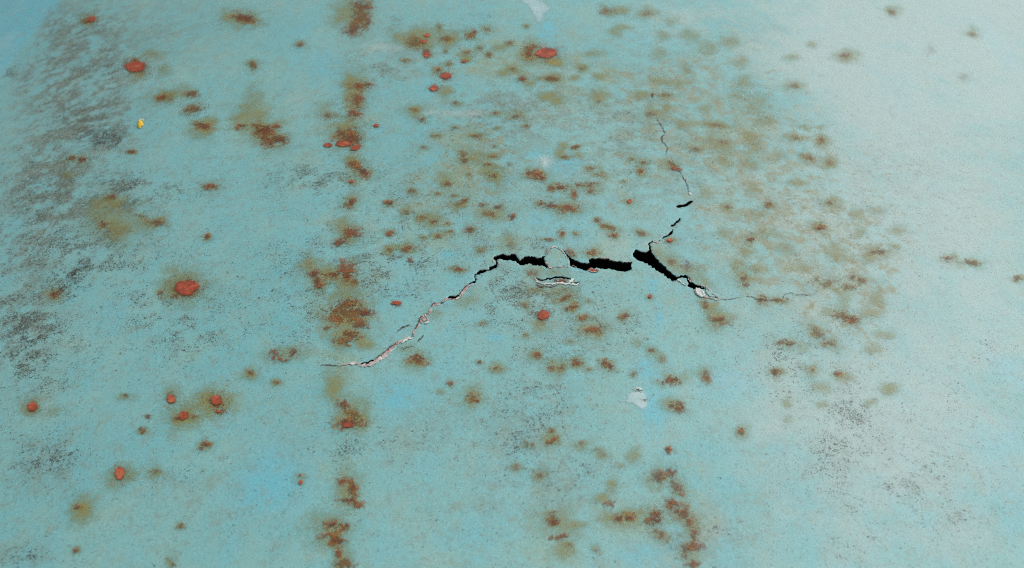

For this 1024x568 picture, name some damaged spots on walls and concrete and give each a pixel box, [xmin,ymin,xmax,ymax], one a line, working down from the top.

rust [337,1,377,38]
rust [230,101,291,149]
rust [324,74,375,180]
crack [322,93,811,367]
rust [304,223,379,348]
rust [172,389,233,427]
peeling [626,387,647,409]
rust [313,476,366,568]
rust [598,446,706,568]